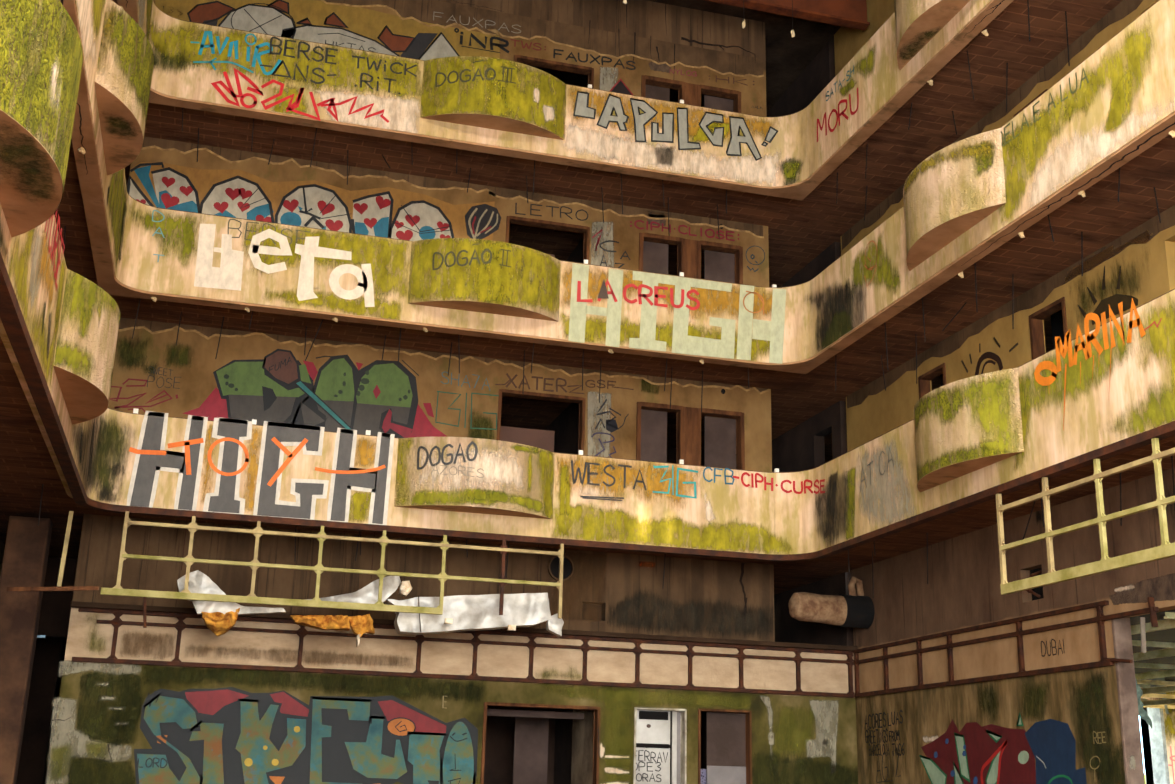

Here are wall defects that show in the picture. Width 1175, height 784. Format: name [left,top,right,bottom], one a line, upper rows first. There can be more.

crack [77,103,88,175]
leakage [73,419,130,501]
leakage [816,445,914,545]